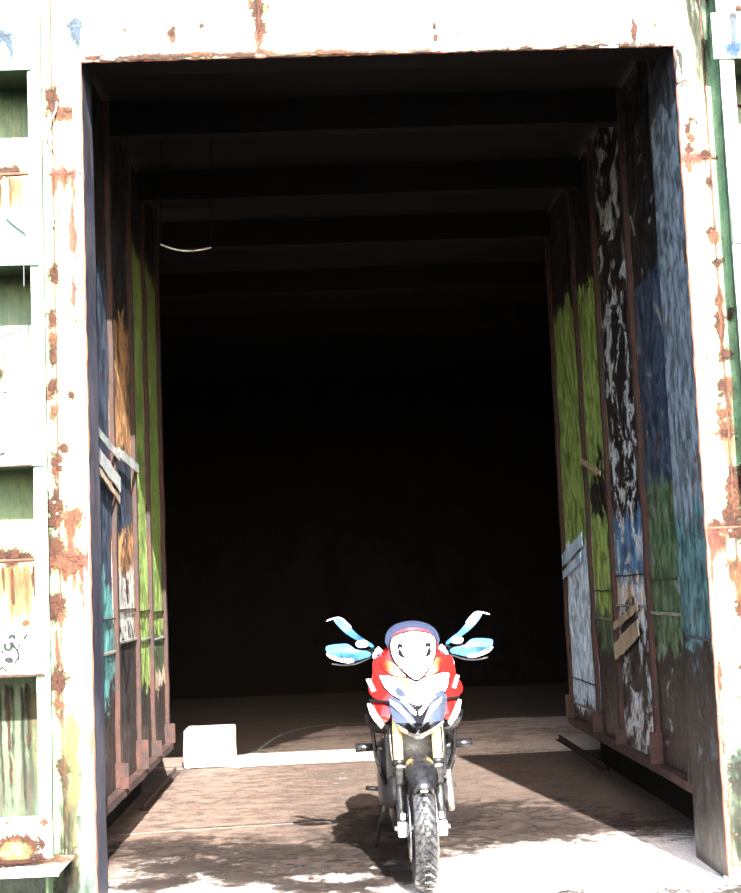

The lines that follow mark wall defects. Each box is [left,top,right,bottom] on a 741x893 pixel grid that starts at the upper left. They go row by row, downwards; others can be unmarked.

corrosion [81,0,442,60]
corrosion [457,17,669,50]
corrosion [41,81,79,122]
corrosion [682,116,714,174]
corrosion [47,262,61,287]
corrosion [711,284,735,362]
corrosion [45,306,77,422]
corrosion [707,375,741,616]
corrosion [0,442,91,727]
corrosion [53,747,71,803]
corrosion [88,724,96,891]
corrosion [0,817,77,871]